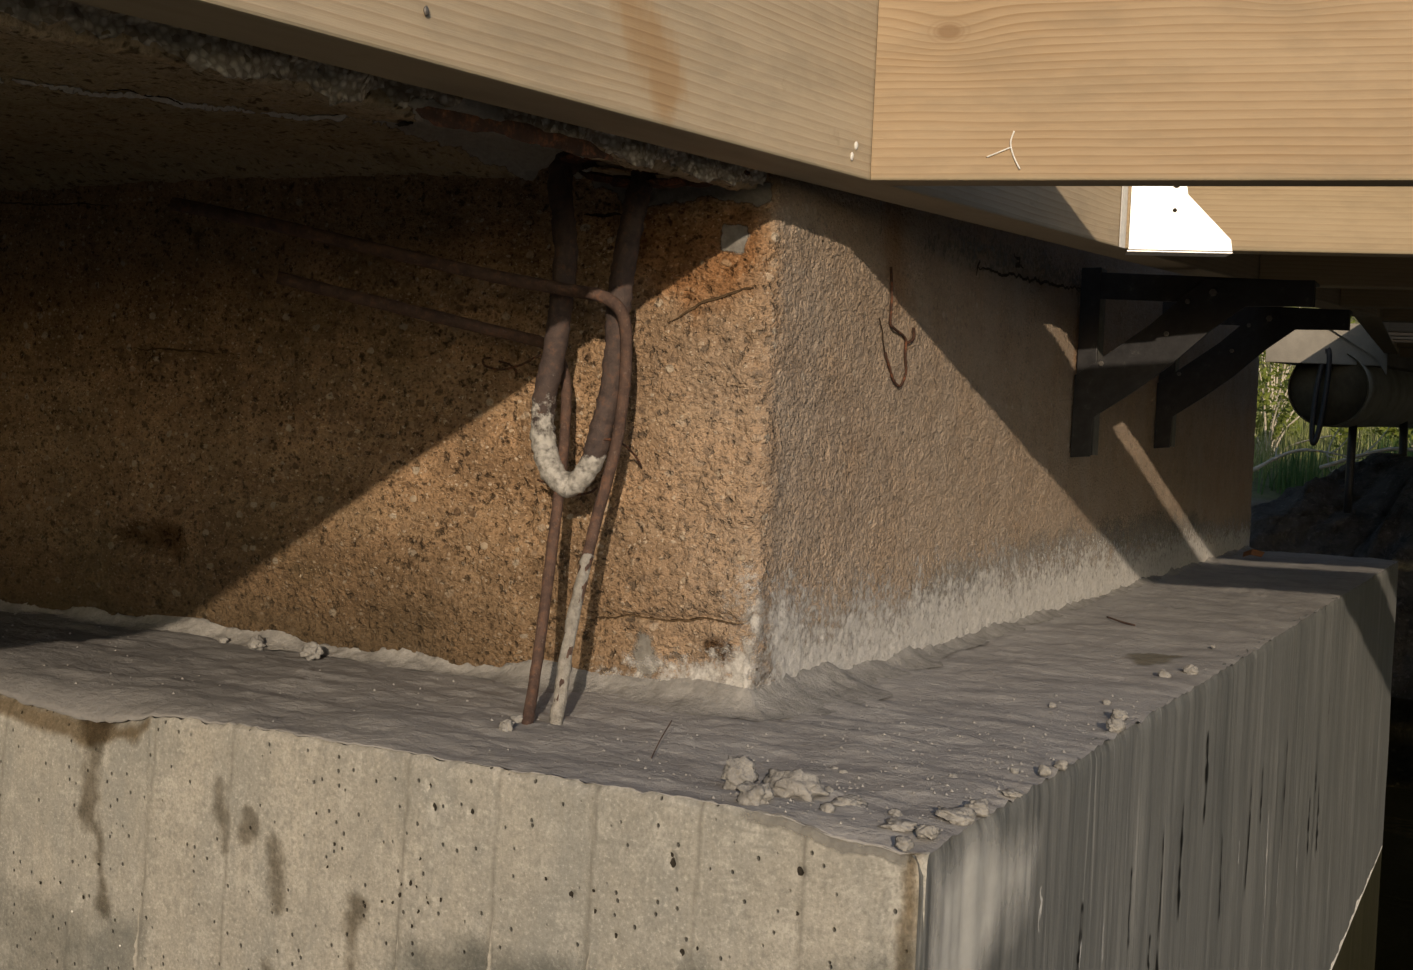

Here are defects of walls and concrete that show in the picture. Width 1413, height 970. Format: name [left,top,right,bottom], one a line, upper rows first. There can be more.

crack [0,77,348,122]
corrosion [579,171,713,189]
crack [976,253,1081,290]
spalling [169,151,656,725]
crack [595,614,749,625]
leakage [1130,653,1183,665]